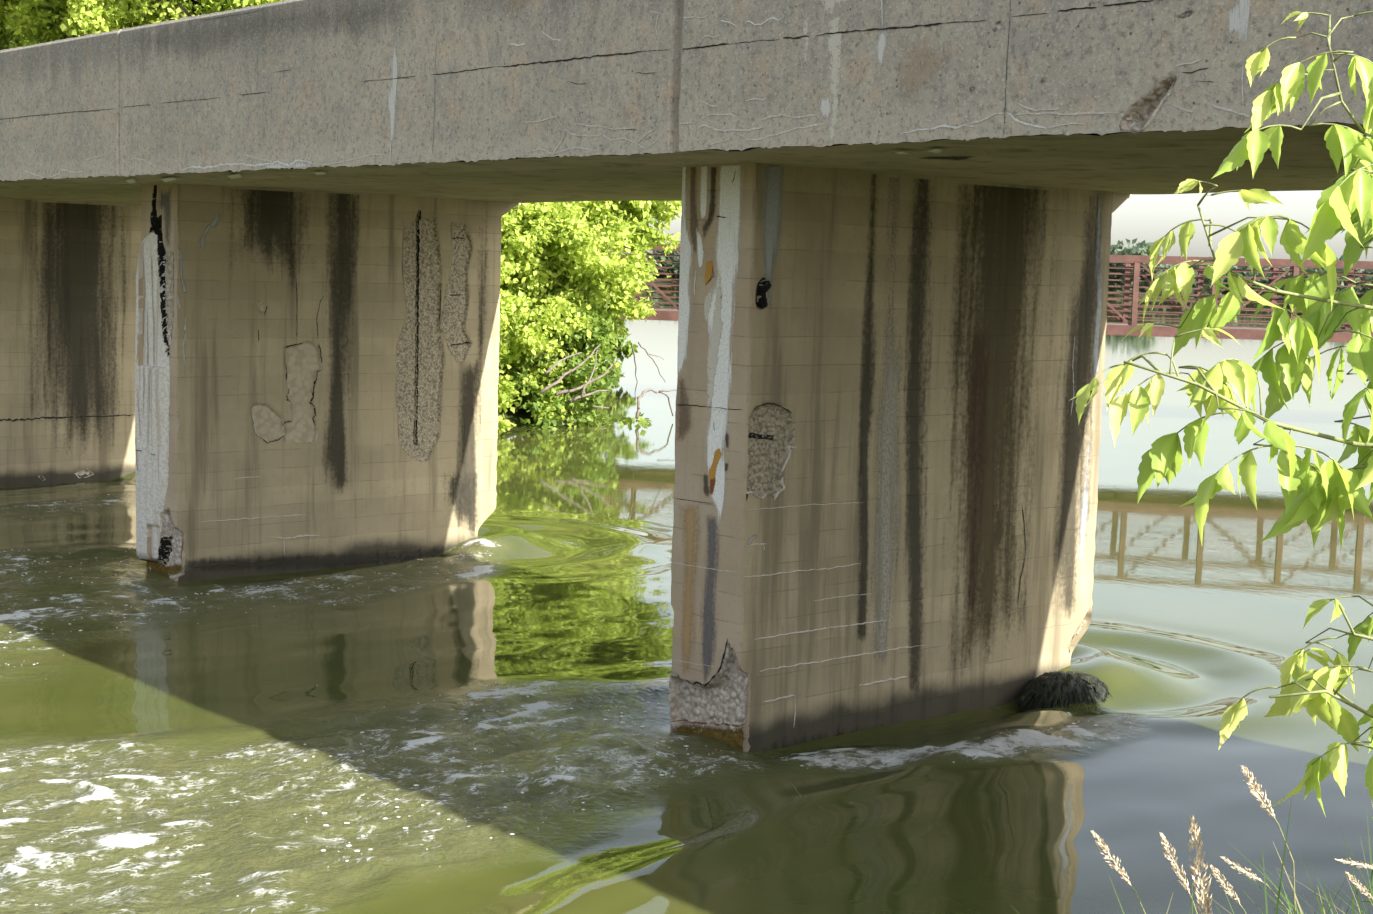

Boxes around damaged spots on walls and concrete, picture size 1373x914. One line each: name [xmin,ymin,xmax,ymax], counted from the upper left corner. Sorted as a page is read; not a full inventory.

crack [361,0,1153,154]
spalling [1119,75,1176,131]
crack [1172,59,1251,117]
crack [24,153,387,357]
spalling [396,210,473,462]
damp [450,269,485,531]
rust [704,434,729,495]
damp [858,174,930,689]
damp [952,185,1047,661]
damp [1056,193,1102,609]
rust [682,509,697,668]
spalling [668,638,923,752]